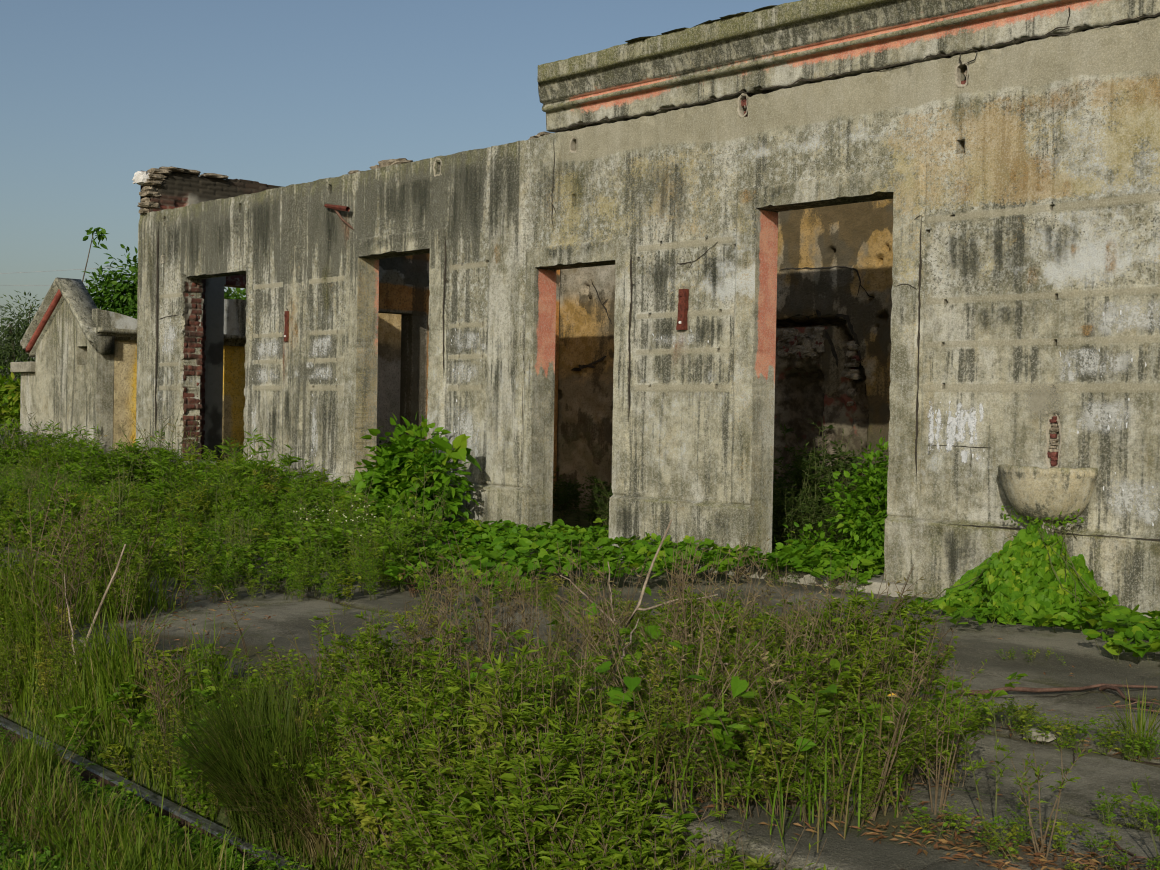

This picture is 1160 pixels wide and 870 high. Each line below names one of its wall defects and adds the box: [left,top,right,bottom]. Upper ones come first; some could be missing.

spalling [137,166,229,214]
leakage [951,239,976,274]
spalling [777,327,825,359]
spalling [844,341,862,407]
spalling [1045,411,1062,468]
peeling [1077,398,1130,434]